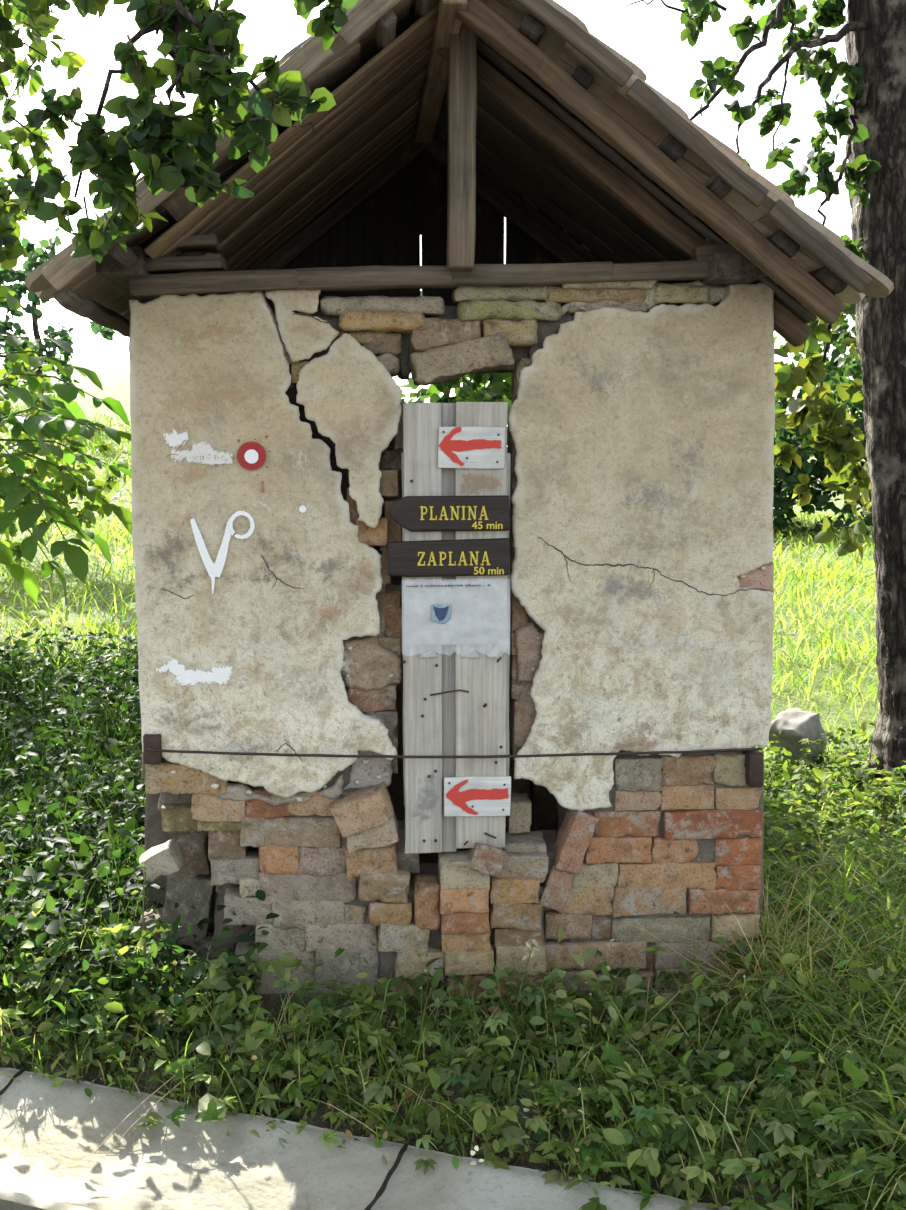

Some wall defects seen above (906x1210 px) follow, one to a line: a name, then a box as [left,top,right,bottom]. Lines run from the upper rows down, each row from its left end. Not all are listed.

crack [262,292,382,554]
crack [539,537,769,596]
spalling [737,562,774,594]
spalling [341,636,402,691]
spalling [515,622,544,683]
spalling [211,750,393,806]